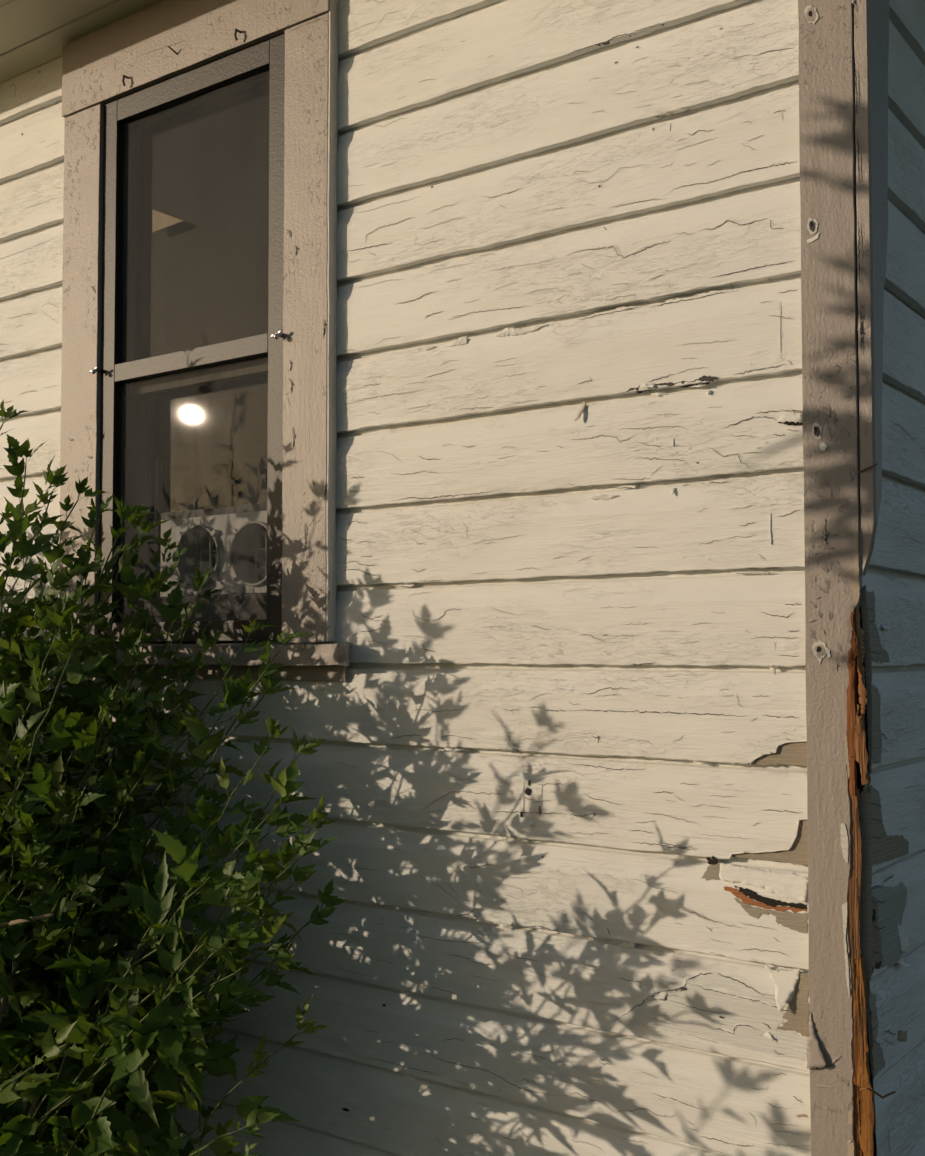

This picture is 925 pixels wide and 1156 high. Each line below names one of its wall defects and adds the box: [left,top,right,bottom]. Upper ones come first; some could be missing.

crack [332,849,558,981]
crack [367,785,920,1154]
peeling [615,954,808,1062]